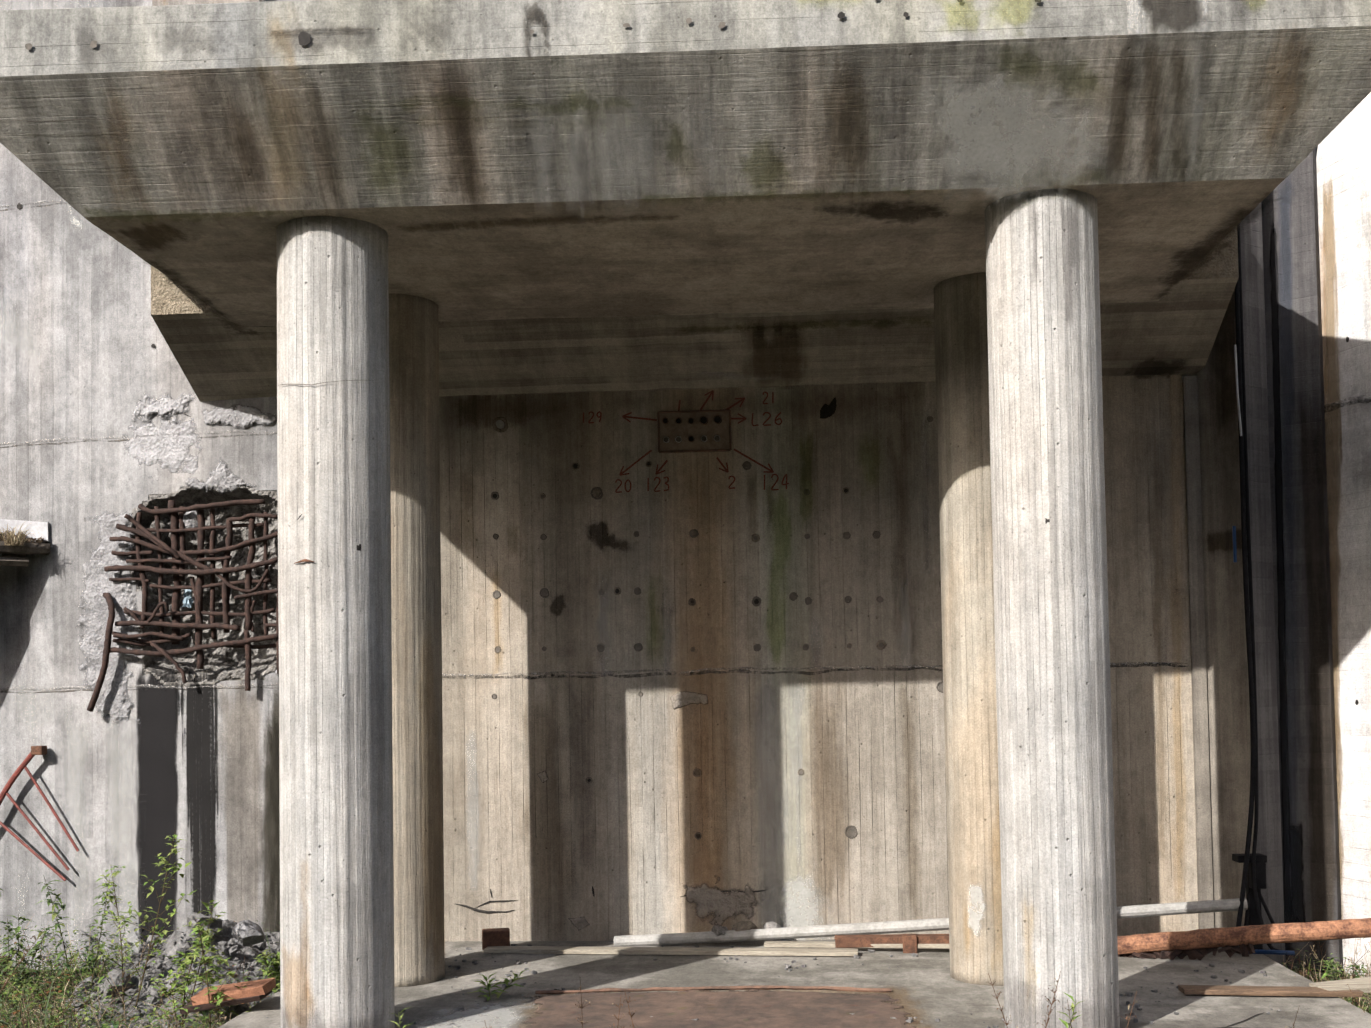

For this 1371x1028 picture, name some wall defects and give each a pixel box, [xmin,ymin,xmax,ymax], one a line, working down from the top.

spalling [77,394,279,723]
damp [136,667,218,946]
spalling [685,876,756,925]